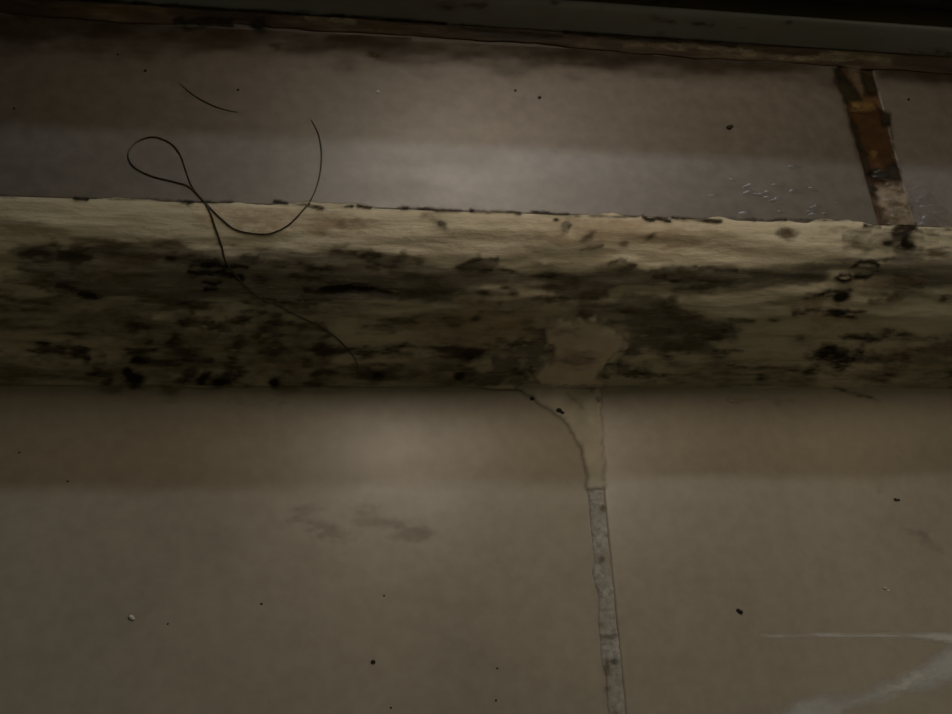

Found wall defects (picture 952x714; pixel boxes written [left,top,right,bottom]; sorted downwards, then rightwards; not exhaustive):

leakage [10,203,952,392]
leakage [790,633,952,714]